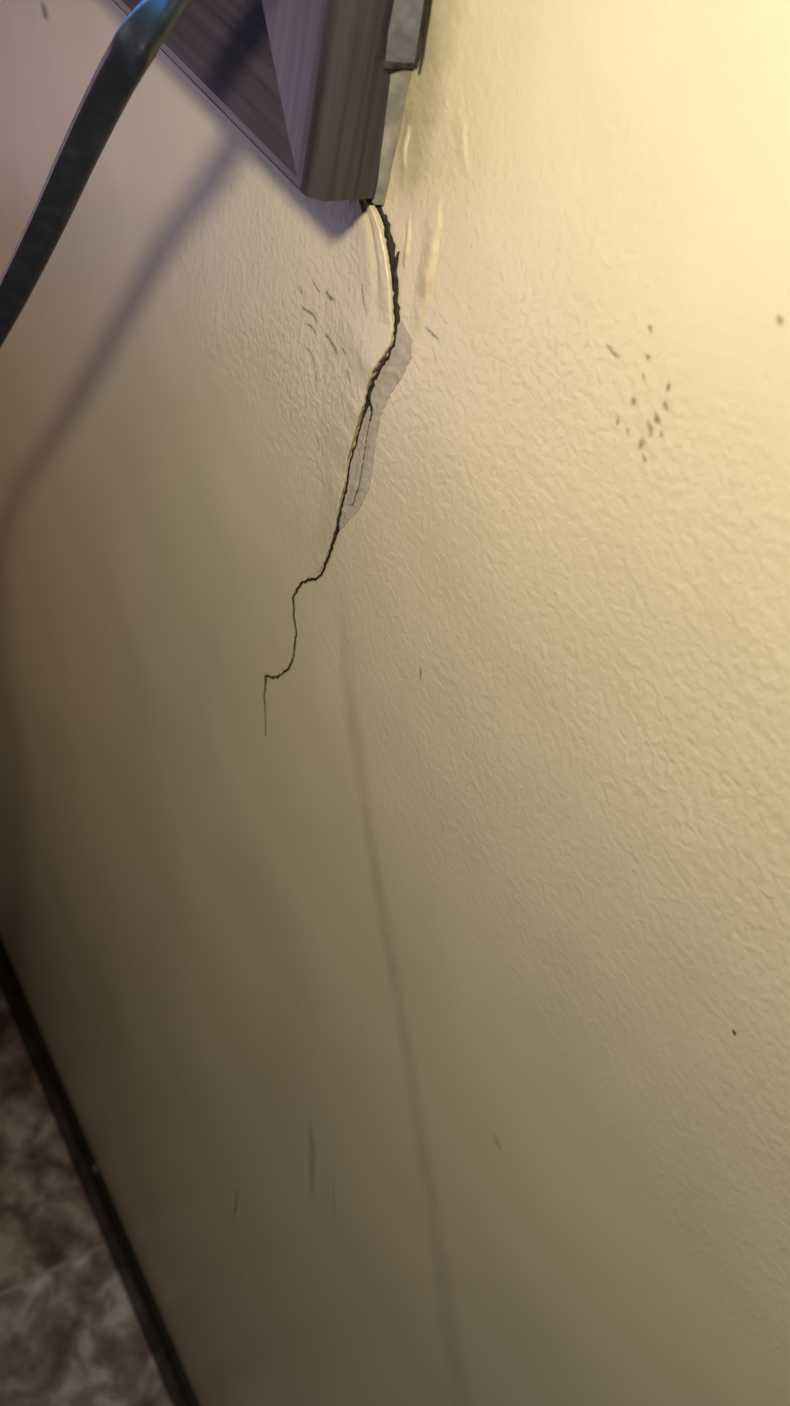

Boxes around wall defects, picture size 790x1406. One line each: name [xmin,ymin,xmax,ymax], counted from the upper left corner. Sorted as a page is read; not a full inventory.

crack [263,204,400,736]